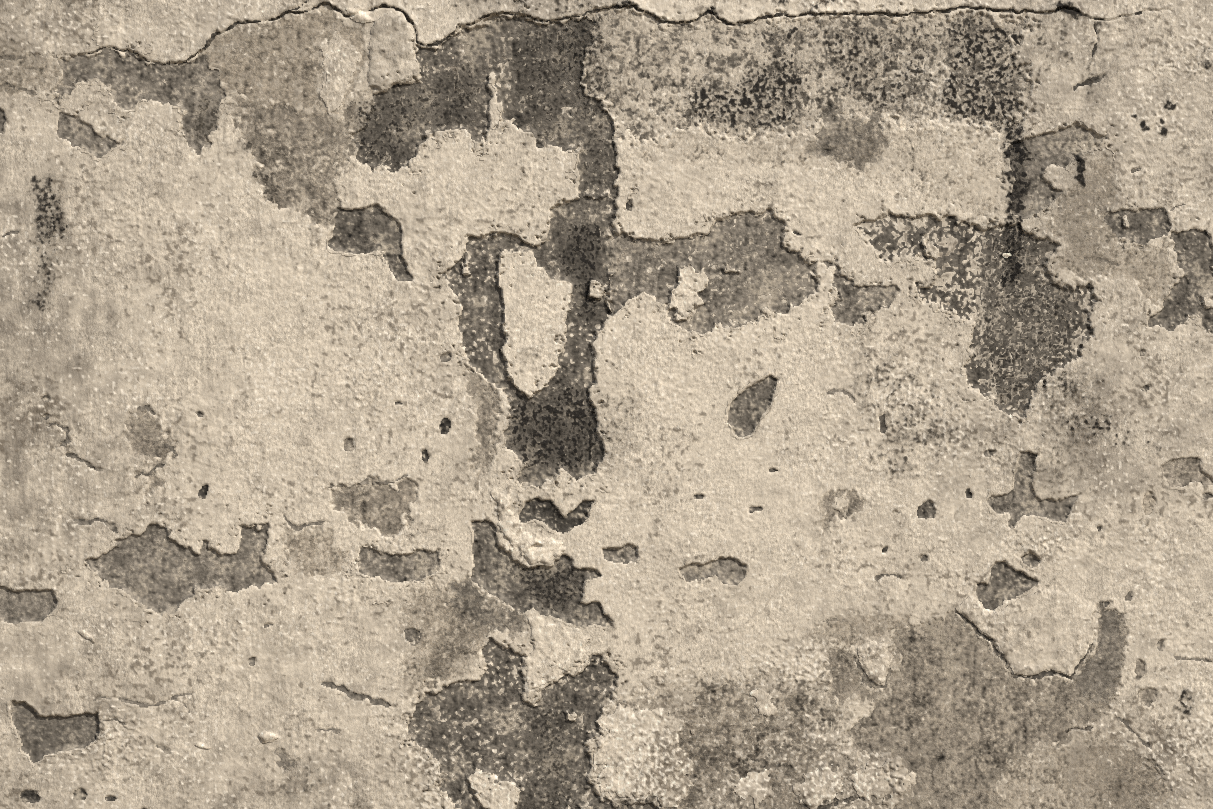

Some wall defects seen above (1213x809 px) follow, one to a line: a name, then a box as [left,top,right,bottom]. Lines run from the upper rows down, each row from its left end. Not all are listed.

crack [88,0,1142,91]
flaking render [320,0,1118,533]
flaking render [1097,185,1213,336]
flaking render [0,584,61,624]
flaking render [61,502,278,626]
flaking render [344,540,449,587]
flaking render [467,520,640,631]
crack [955,612,1094,680]
flaking render [956,549,1110,676]
flaking render [7,700,101,767]
flaking render [400,637,659,809]